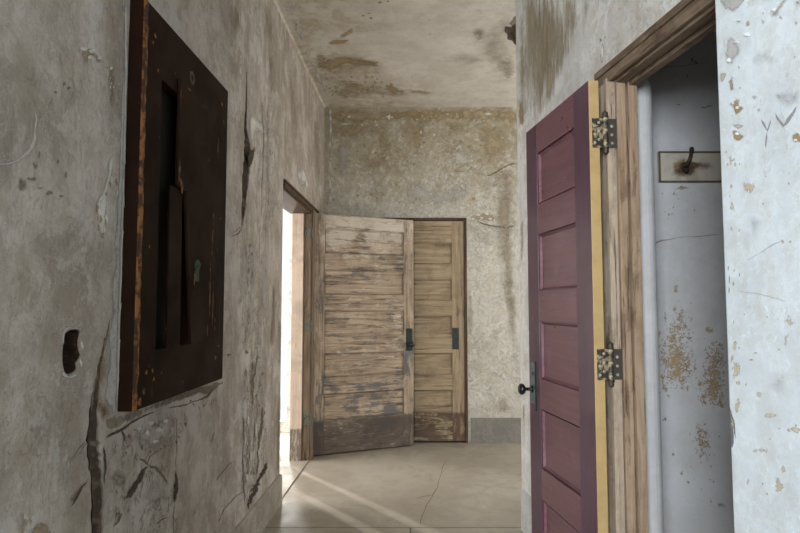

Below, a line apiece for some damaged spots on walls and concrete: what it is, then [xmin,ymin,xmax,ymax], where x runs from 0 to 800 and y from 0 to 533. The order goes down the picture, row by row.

peeling [721,0,743,10]
damp [317,55,403,98]
damp [521,2,570,96]
peeling [724,39,740,68]
damp [331,102,524,155]
peeling [96,158,125,238]
crack [232,83,264,237]
crack [479,163,515,197]
spalling [62,327,84,378]
crack [72,321,178,533]